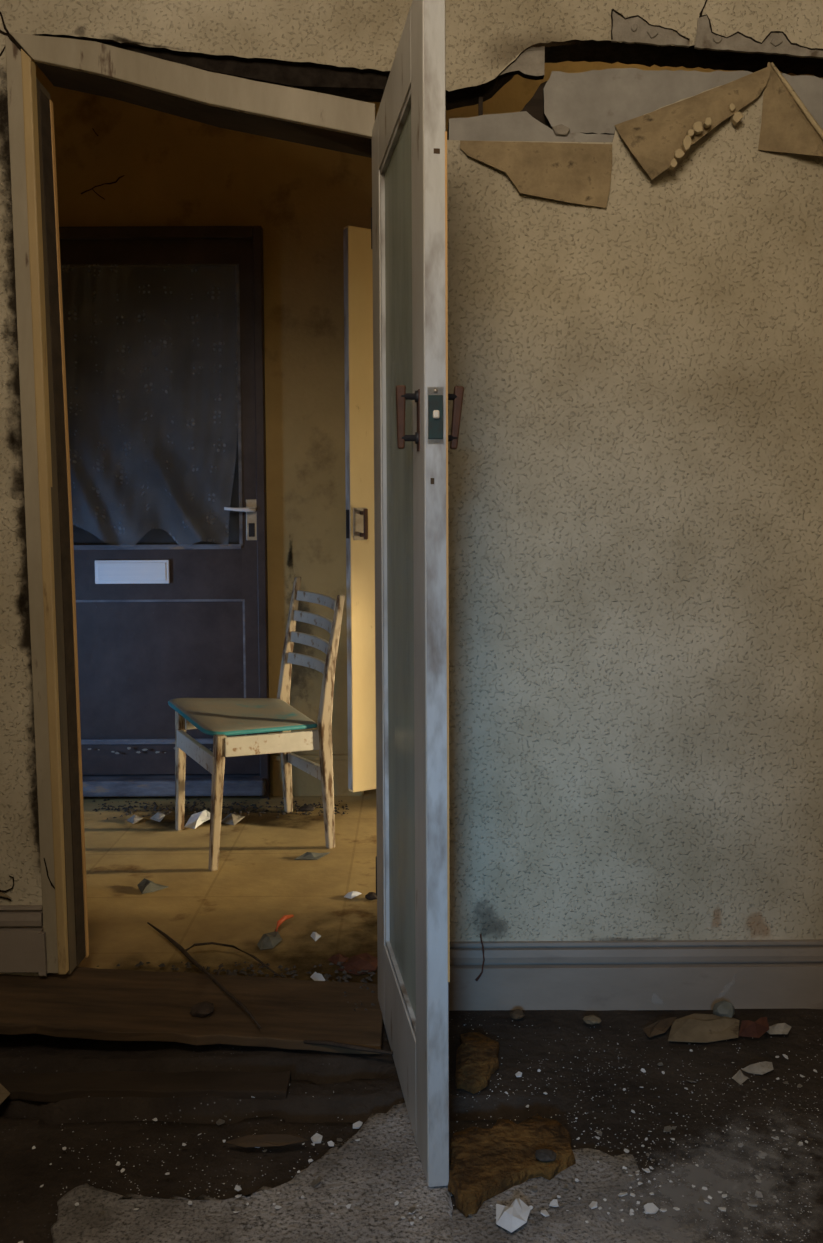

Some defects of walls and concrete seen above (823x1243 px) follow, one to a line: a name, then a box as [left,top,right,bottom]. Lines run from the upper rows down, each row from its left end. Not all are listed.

crack [0,11,32,62]
spalling [611,9,823,59]
spalling [498,46,545,80]
damp [0,74,41,865]